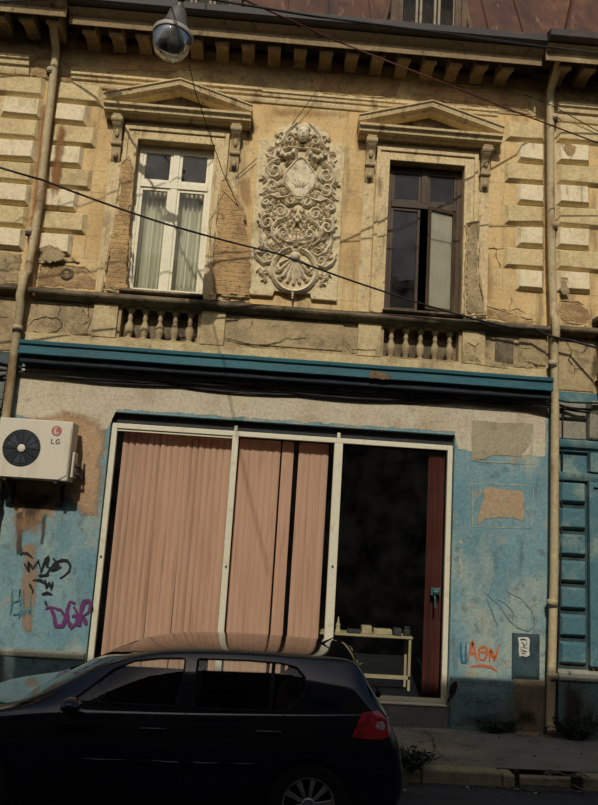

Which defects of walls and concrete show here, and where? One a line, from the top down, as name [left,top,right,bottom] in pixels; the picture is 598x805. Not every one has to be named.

spalling [37,156,135,292]
spalling [208,177,252,298]
crack [28,303,91,336]
crack [225,315,301,349]
peeling [368,370,392,379]
peeling [471,420,533,464]
peeling [472,483,534,528]